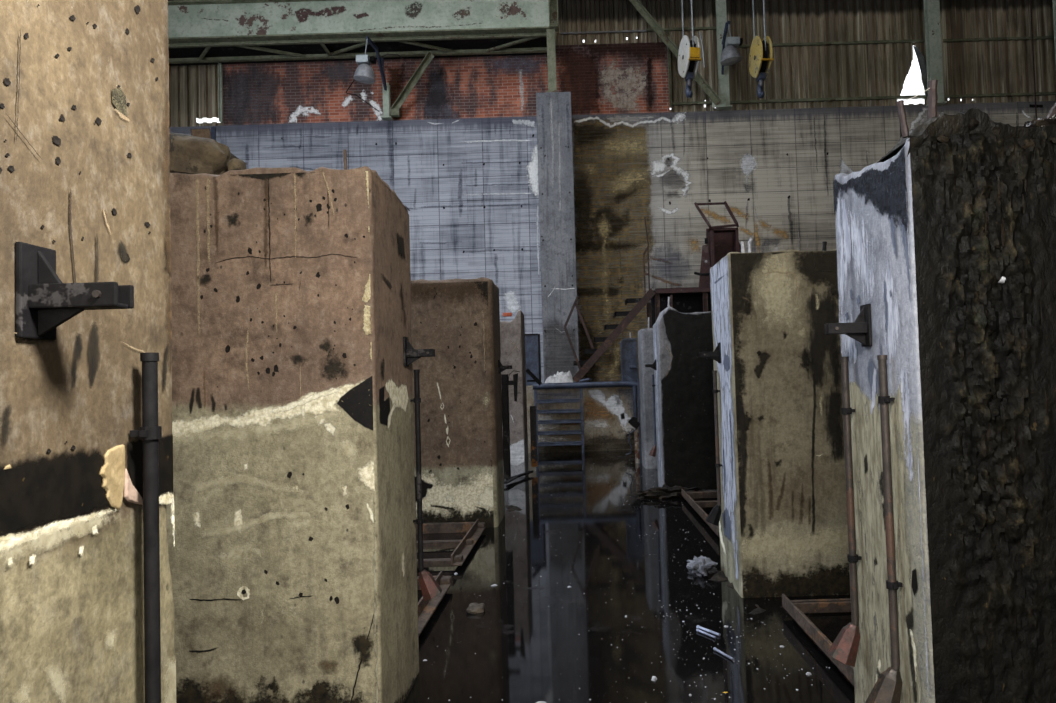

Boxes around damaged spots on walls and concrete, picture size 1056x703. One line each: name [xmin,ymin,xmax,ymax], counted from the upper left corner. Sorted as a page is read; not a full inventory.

efflorescence [289,106,321,123]
efflorescence [342,90,382,121]
crack [216,178,357,290]
water stain [381,114,548,324]
water stain [537,61,692,483]
corrosion [701,207,787,253]
spalling [250,308,292,376]
spalling [334,274,372,359]
peeling [100,444,143,510]
water stain [510,439,524,465]
water stain [682,198,929,703]
spalling [358,461,379,703]